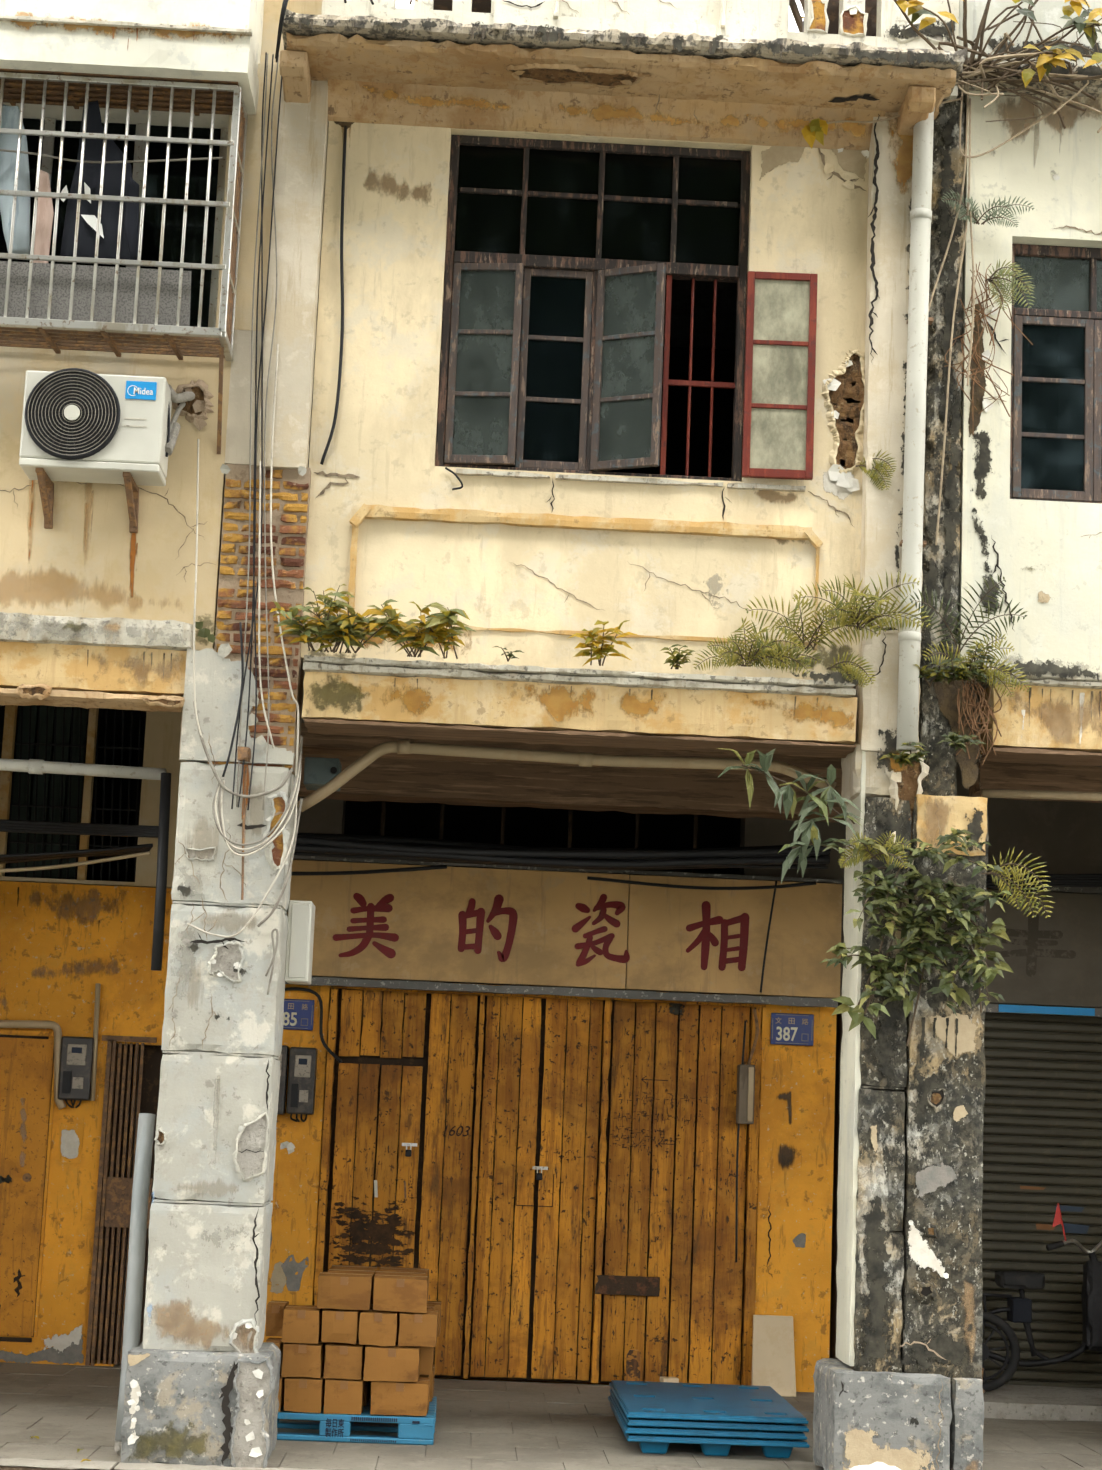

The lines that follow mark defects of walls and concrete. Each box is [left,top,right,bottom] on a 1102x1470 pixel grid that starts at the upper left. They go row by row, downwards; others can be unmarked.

crack [503,0,579,13]
water stain [852,19,1102,140]
crack [818,94,880,362]
spalling [821,349,865,500]
water stain [894,361,907,589]
water stain [921,115,1003,789]
corrosion [130,533,138,597]
spalling [207,464,311,776]
water stain [877,729,901,772]
peeling [928,1013,978,1058]
peeling [907,1220,975,1351]
crack [219,1362,238,1464]